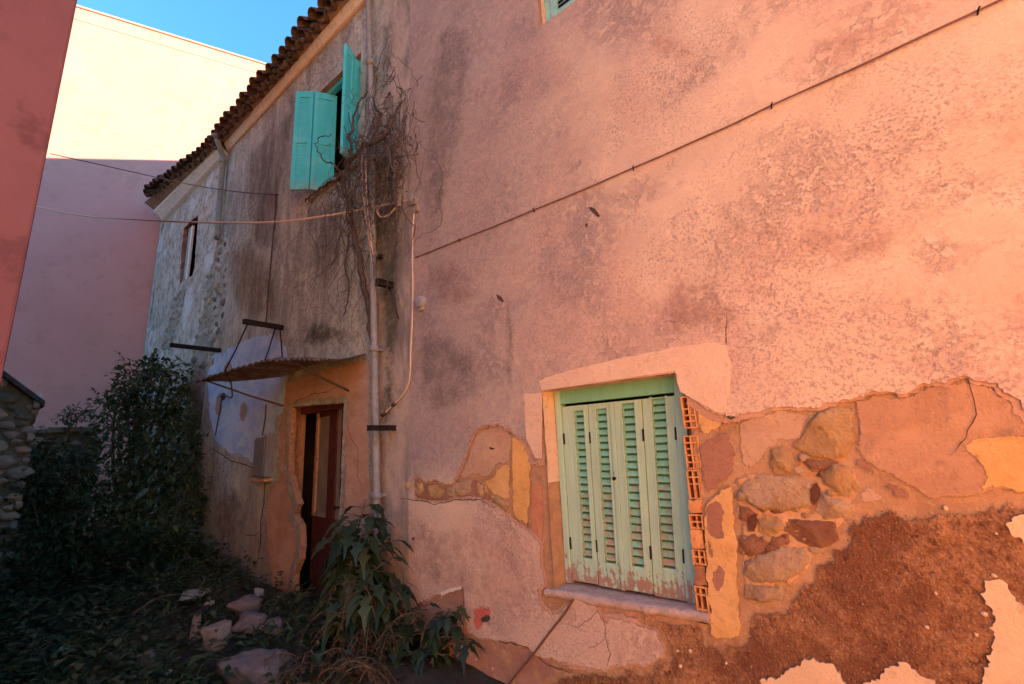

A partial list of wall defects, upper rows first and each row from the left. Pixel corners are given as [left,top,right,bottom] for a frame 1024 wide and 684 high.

peeling [207,333,289,468]
spalling [400,379,1024,684]
crack [568,610,611,665]